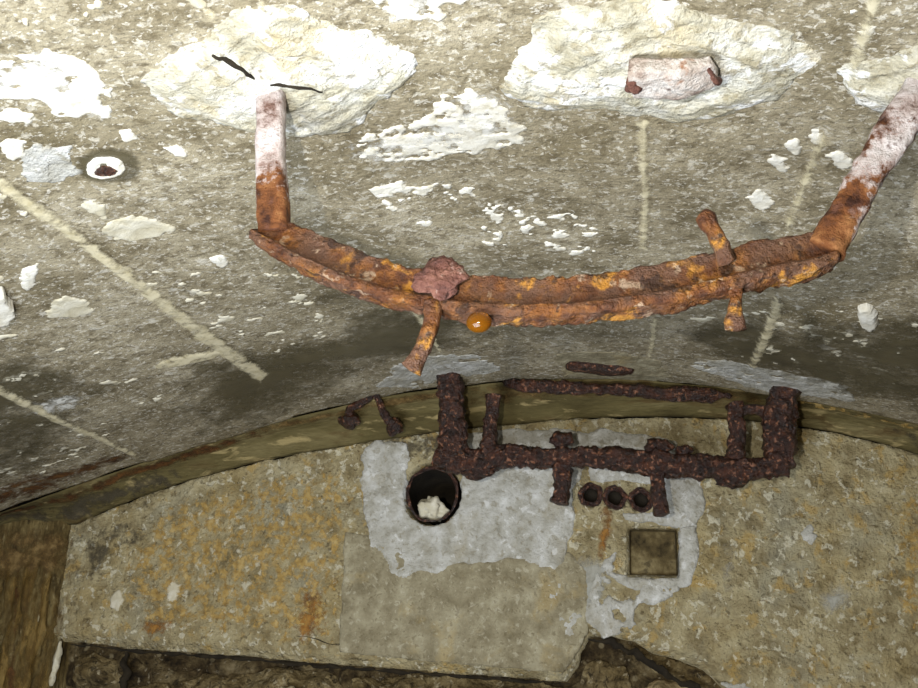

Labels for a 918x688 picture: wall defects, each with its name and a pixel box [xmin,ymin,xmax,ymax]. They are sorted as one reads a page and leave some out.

peeling [83,0,105,17]
peeling [373,0,469,22]
peeling [0,49,113,125]
peeling [352,88,527,162]
peeling [19,263,39,291]
peeling [0,276,18,341]
peeling [45,296,95,318]
peeling [99,378,138,386]
peeling [31,428,87,475]
corrosion [0,440,237,521]